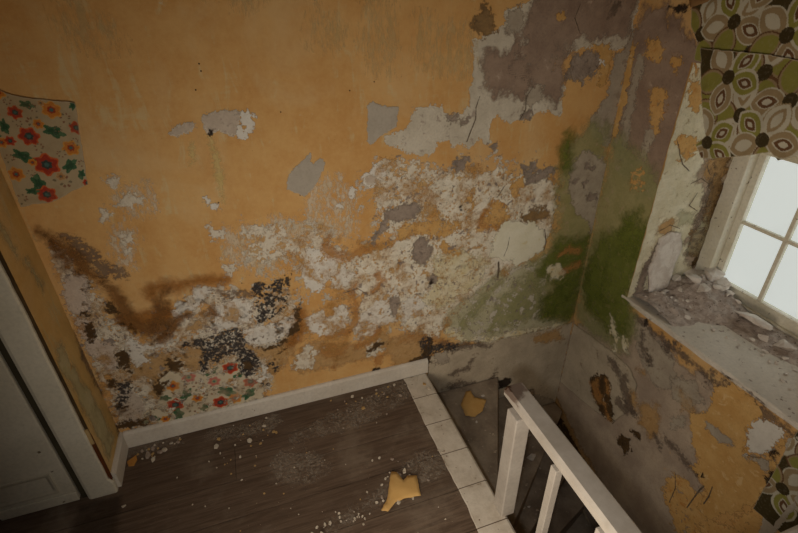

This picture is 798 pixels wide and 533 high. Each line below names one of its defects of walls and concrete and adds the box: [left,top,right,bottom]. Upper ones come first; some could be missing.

peeling [98,173,158,269]
peeling [204,0,733,406]
leakage [35,230,309,430]
peeling [660,369,786,533]